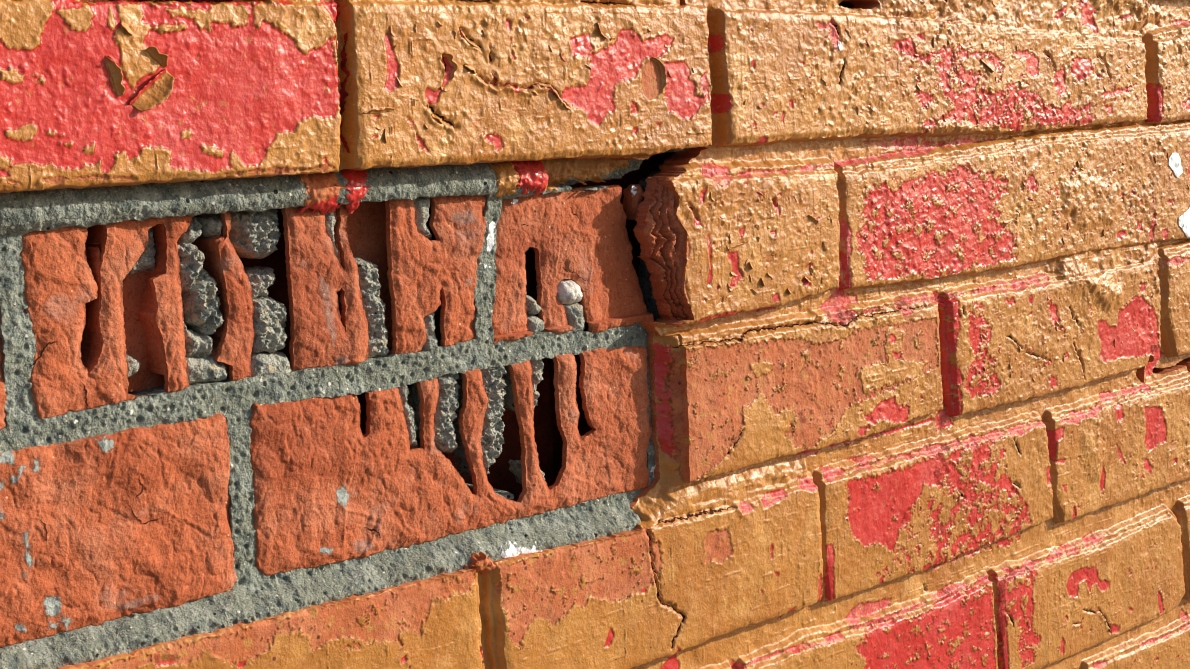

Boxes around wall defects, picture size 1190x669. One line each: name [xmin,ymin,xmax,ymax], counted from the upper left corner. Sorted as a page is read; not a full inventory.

peeling [411,53,458,129]
crack [429,107,454,128]
crack [442,0,571,110]
crack [580,0,631,8]
peeling [512,22,830,135]
peeling [700,33,1167,206]
peeling [698,216,776,303]
peeling [820,163,1026,325]
crack [673,304,932,348]
peeling [797,281,1174,583]
crack [646,506,733,648]
peeling [730,532,1119,669]